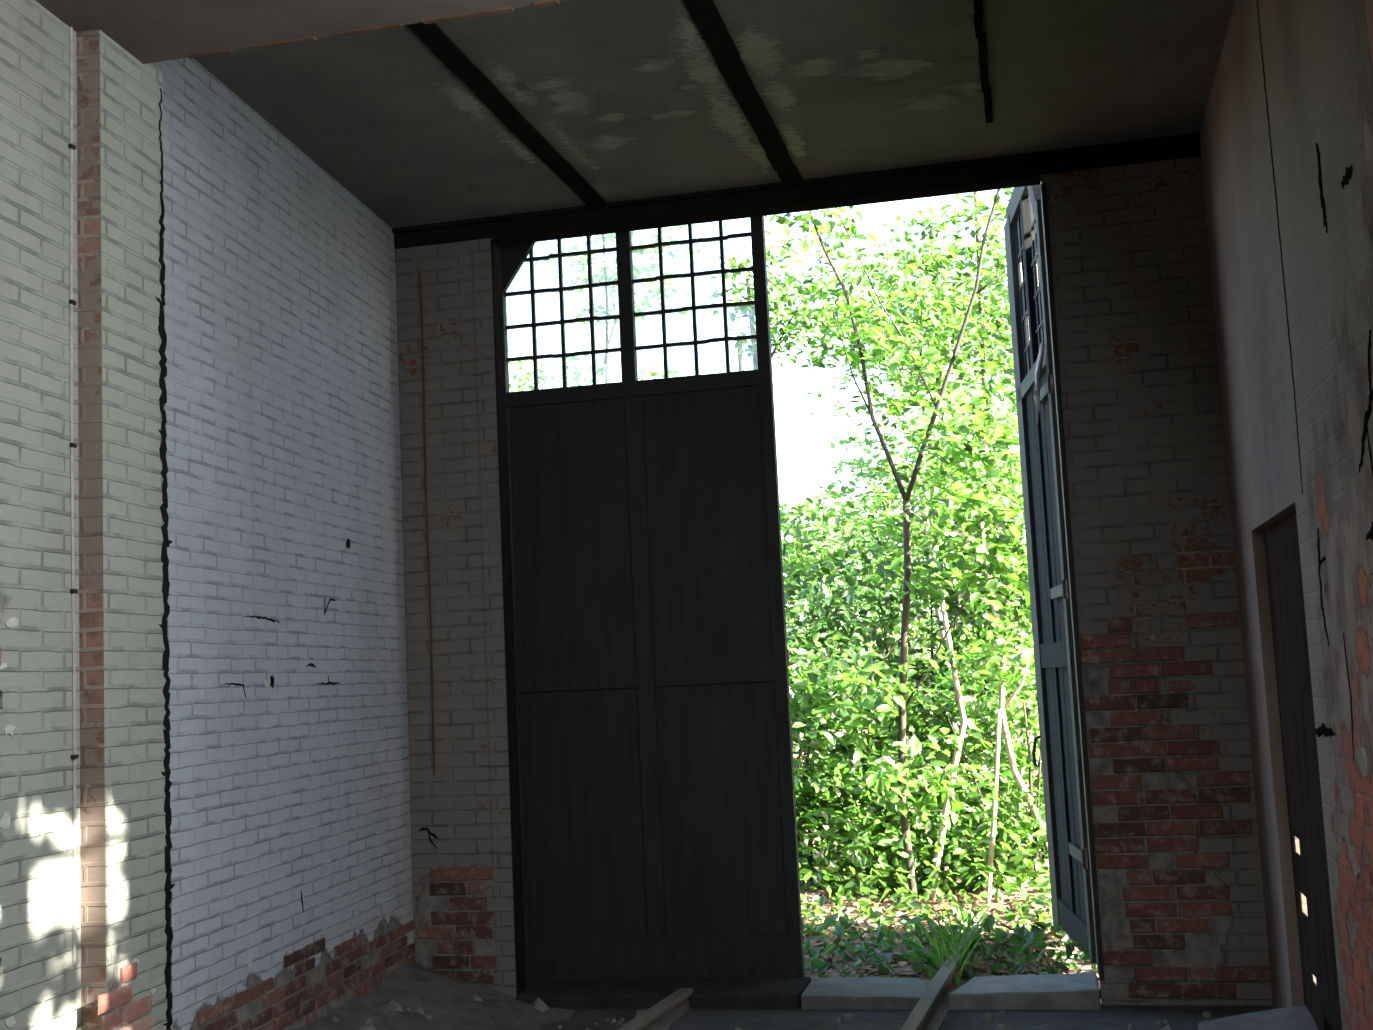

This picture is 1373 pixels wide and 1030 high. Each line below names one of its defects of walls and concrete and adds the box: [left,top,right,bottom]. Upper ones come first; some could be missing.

crack [1256,0,1303,494]
crack [1316,143,1353,233]
crack [1359,330,1373,477]
peeling [0,690,16,737]
peeling [0,595,19,628]
crack [155,88,175,1030]
crack [1314,528,1354,761]
crack [1365,522,1373,575]
peeling [98,864,496,1030]